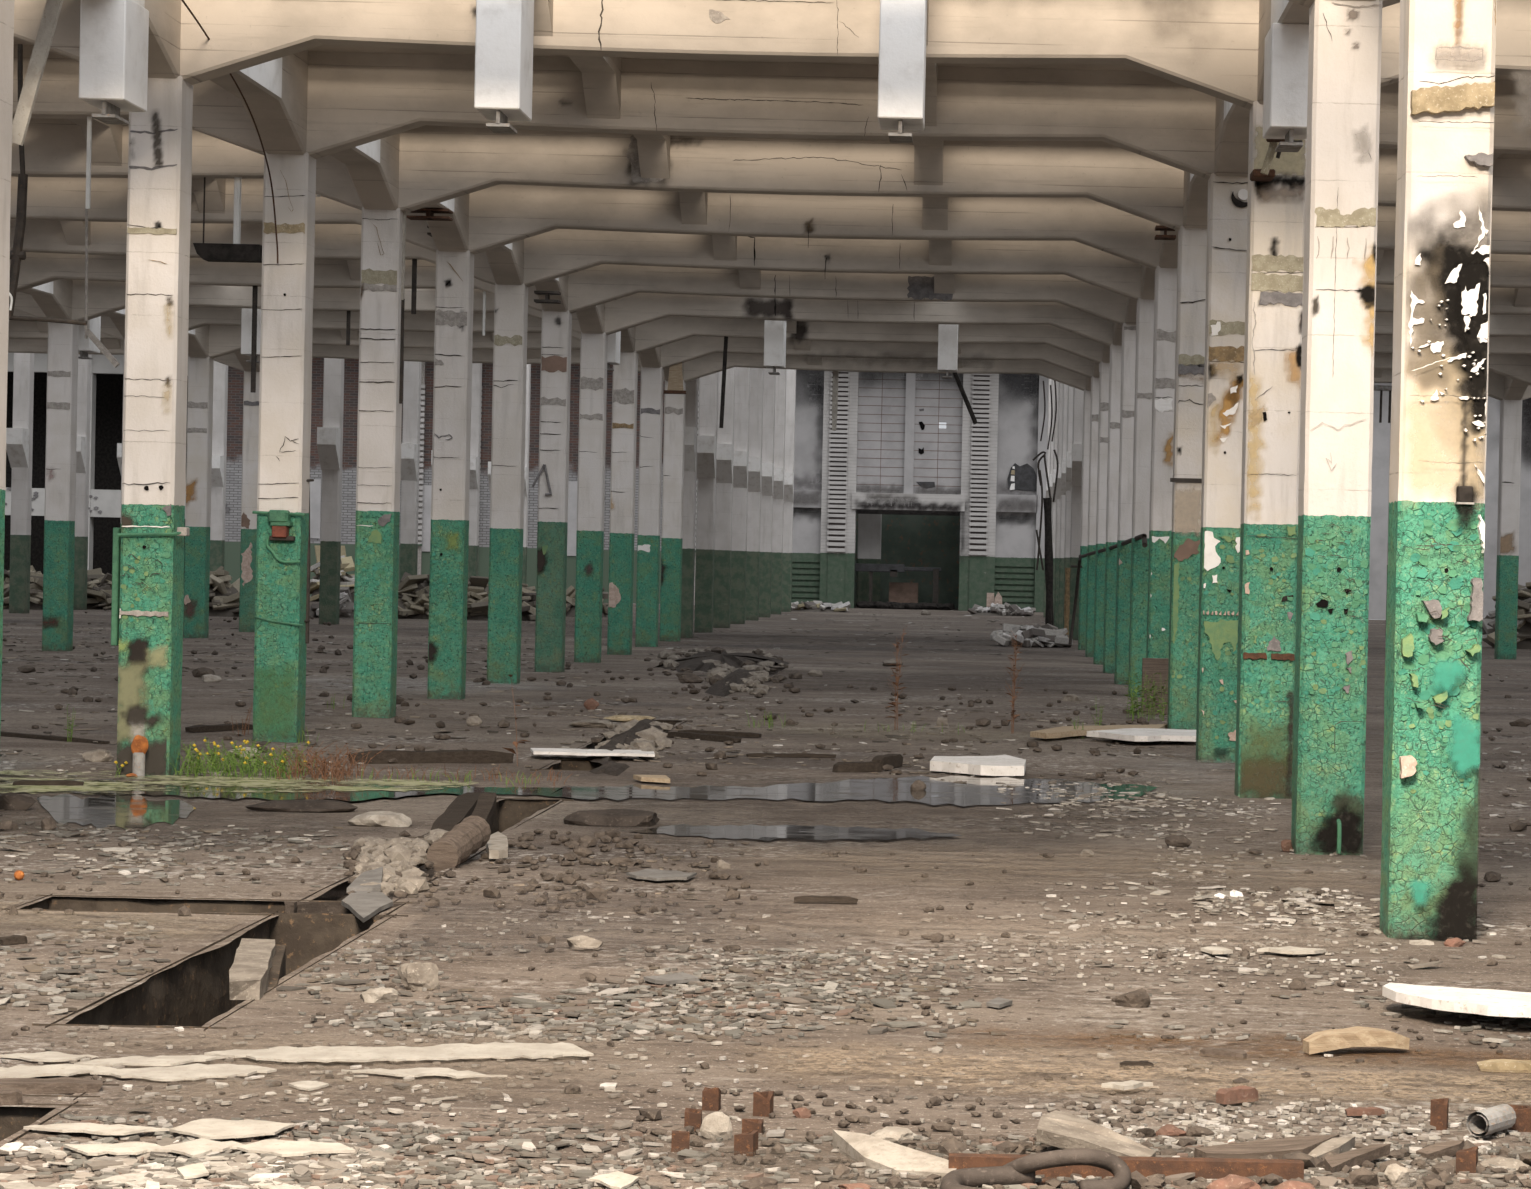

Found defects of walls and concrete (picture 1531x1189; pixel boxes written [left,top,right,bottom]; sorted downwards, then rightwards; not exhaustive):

crack [597,0,605,48]
leakage [745,298,807,343]
peeling [1408,208,1490,441]
corrosion [1202,363,1264,506]
peeling [119,552,191,637]
peeling [1150,526,1368,741]
peeling [1398,514,1485,794]